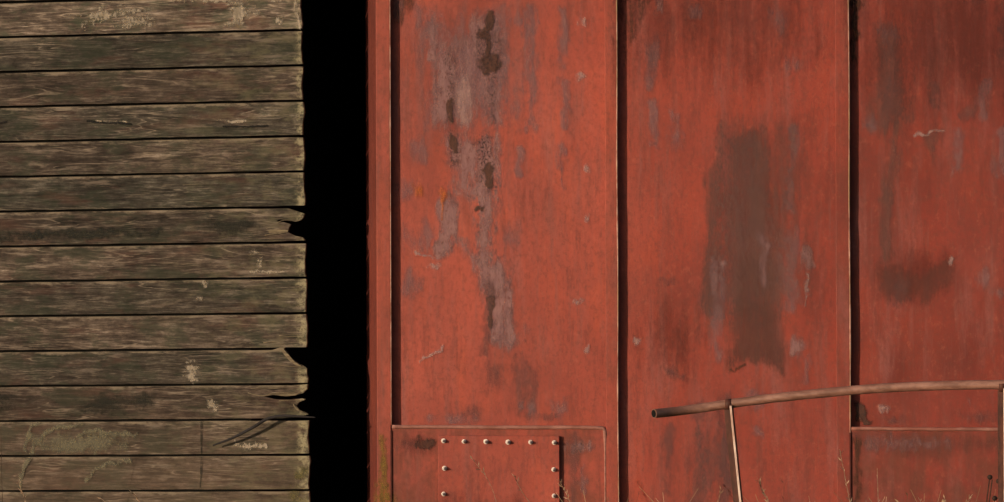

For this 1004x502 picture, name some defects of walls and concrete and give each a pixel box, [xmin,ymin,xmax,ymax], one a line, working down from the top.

peeling [415,14,516,349]